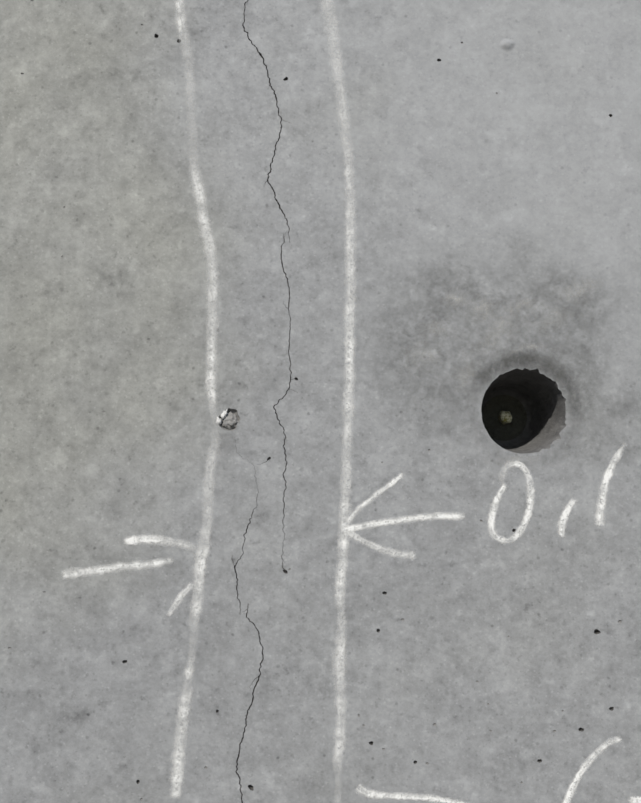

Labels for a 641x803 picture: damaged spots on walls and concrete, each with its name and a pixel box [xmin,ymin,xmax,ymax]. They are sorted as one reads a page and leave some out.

crack [232,0,298,803]